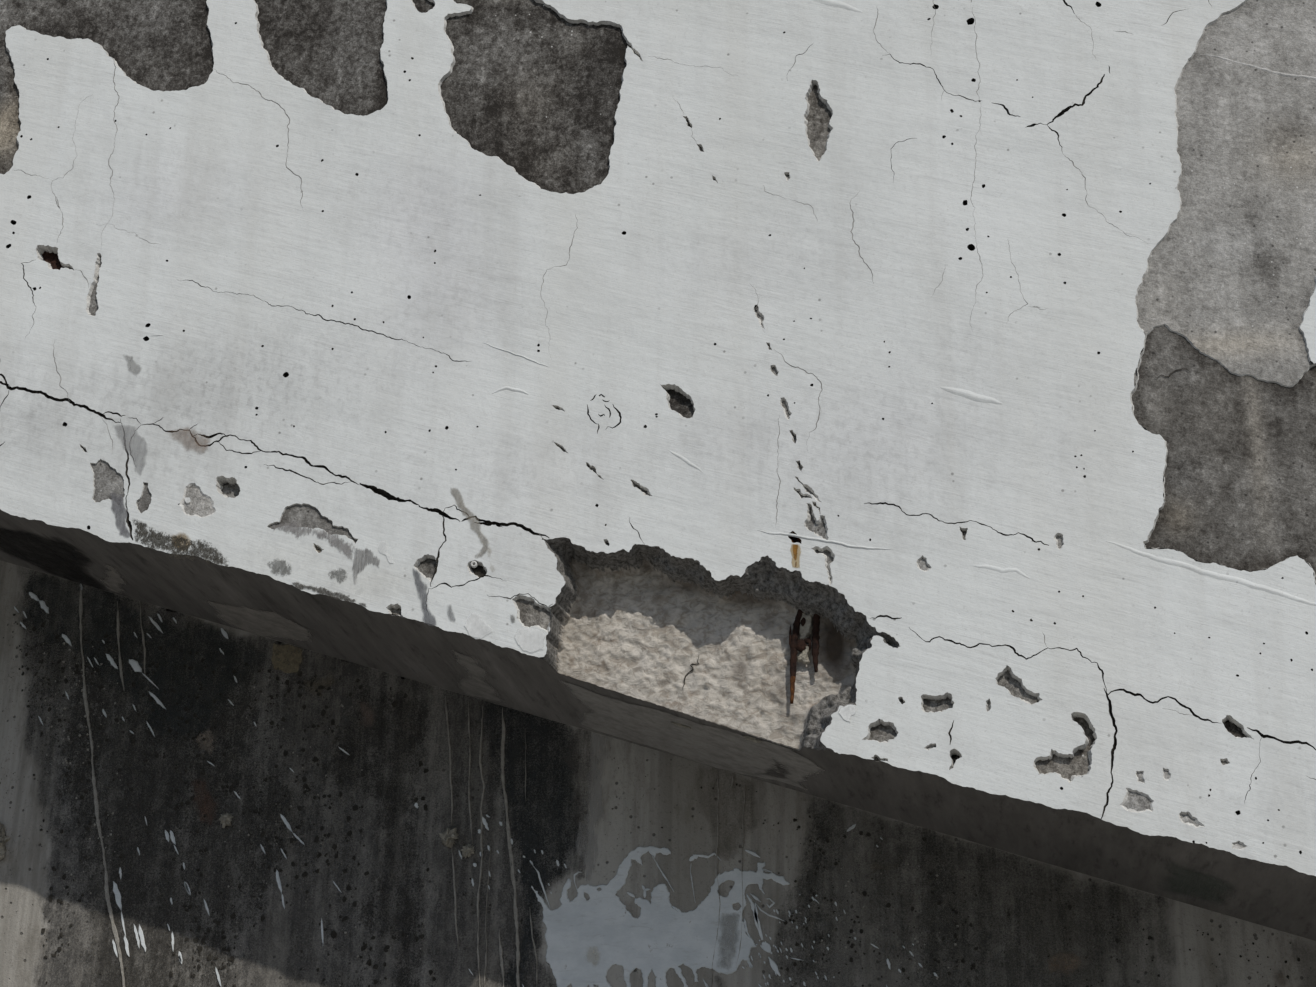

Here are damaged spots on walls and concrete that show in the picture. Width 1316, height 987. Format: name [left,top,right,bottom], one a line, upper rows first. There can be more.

peeling [0,0,214,174]
peeling [253,0,388,116]
peeling [411,0,643,194]
peeling [804,80,833,162]
crack [873,0,1145,327]
crack [0,64,552,607]
peeling [1130,0,1316,584]
spalling [512,460,901,751]
corrosion [791,544,800,568]
leakage [0,522,823,987]
peeling [1033,712,1097,790]
crack [872,615,1316,819]